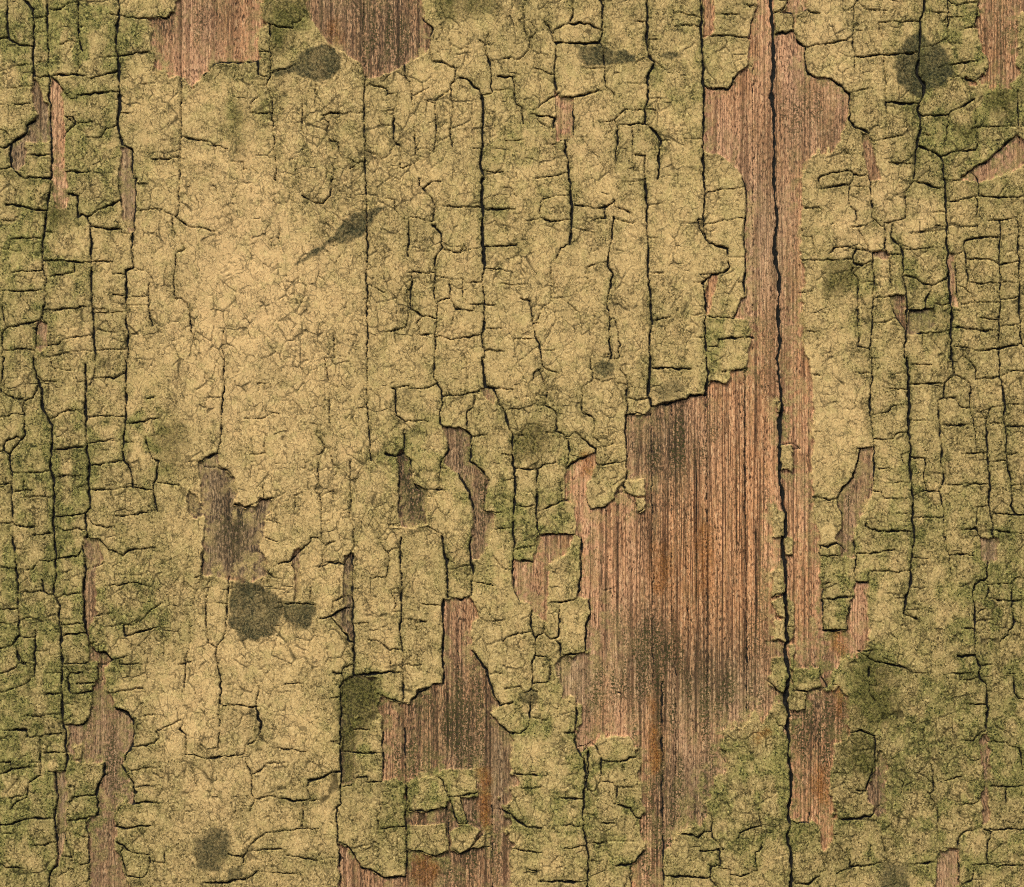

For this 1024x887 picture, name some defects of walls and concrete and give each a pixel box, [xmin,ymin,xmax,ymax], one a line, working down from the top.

damp [275,44,340,80]
peeling [300,0,437,81]
damp [896,35,954,97]
damp [297,207,384,265]
crack [0,0,769,887]
peeling [508,0,885,887]
crack [651,0,1024,887]
peeling [183,449,276,585]
damp [228,579,314,640]
peeling [51,534,139,887]
peeling [335,594,523,887]
damp [195,829,238,879]